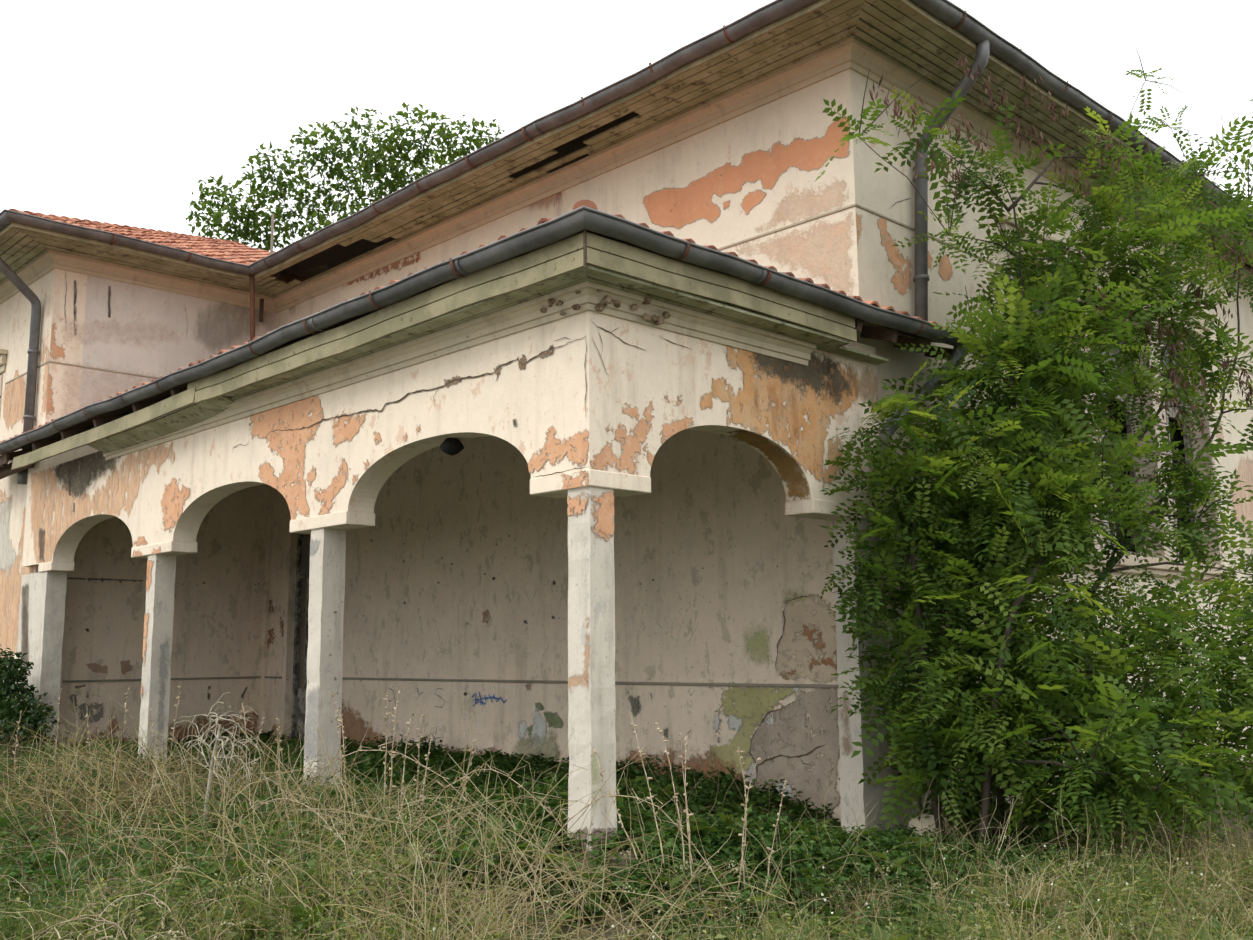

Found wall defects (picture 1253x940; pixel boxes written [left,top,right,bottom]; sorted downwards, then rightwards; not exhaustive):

peeling [642,116,850,229]
peeling [737,180,862,295]
peeling [877,217,912,295]
peeling [928,251,954,281]
peeling [249,395,383,520]
crack [232,323,690,452]
peeling [528,346,859,542]
water stain [753,353,878,408]
peeling [0,441,190,658]
flaking render [627,691,652,716]
flaking render [700,594,840,819]